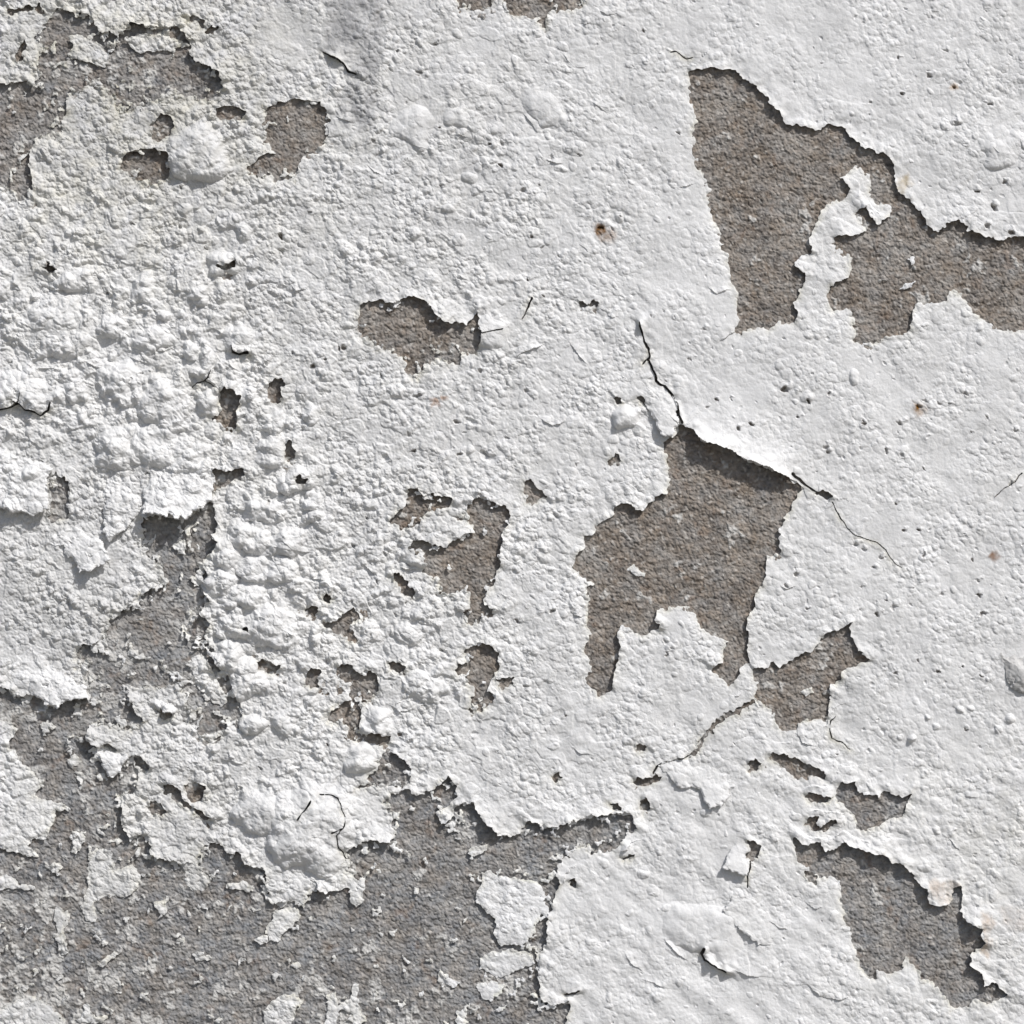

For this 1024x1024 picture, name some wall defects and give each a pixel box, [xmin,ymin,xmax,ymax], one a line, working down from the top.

peeling [0,0,335,208]
peeling [354,291,485,377]
crack [639,322,684,425]
peeling [688,61,1024,350]
peeling [572,384,877,731]
crack [791,472,902,568]
peeling [0,447,735,1024]
peeling [745,747,1013,1008]